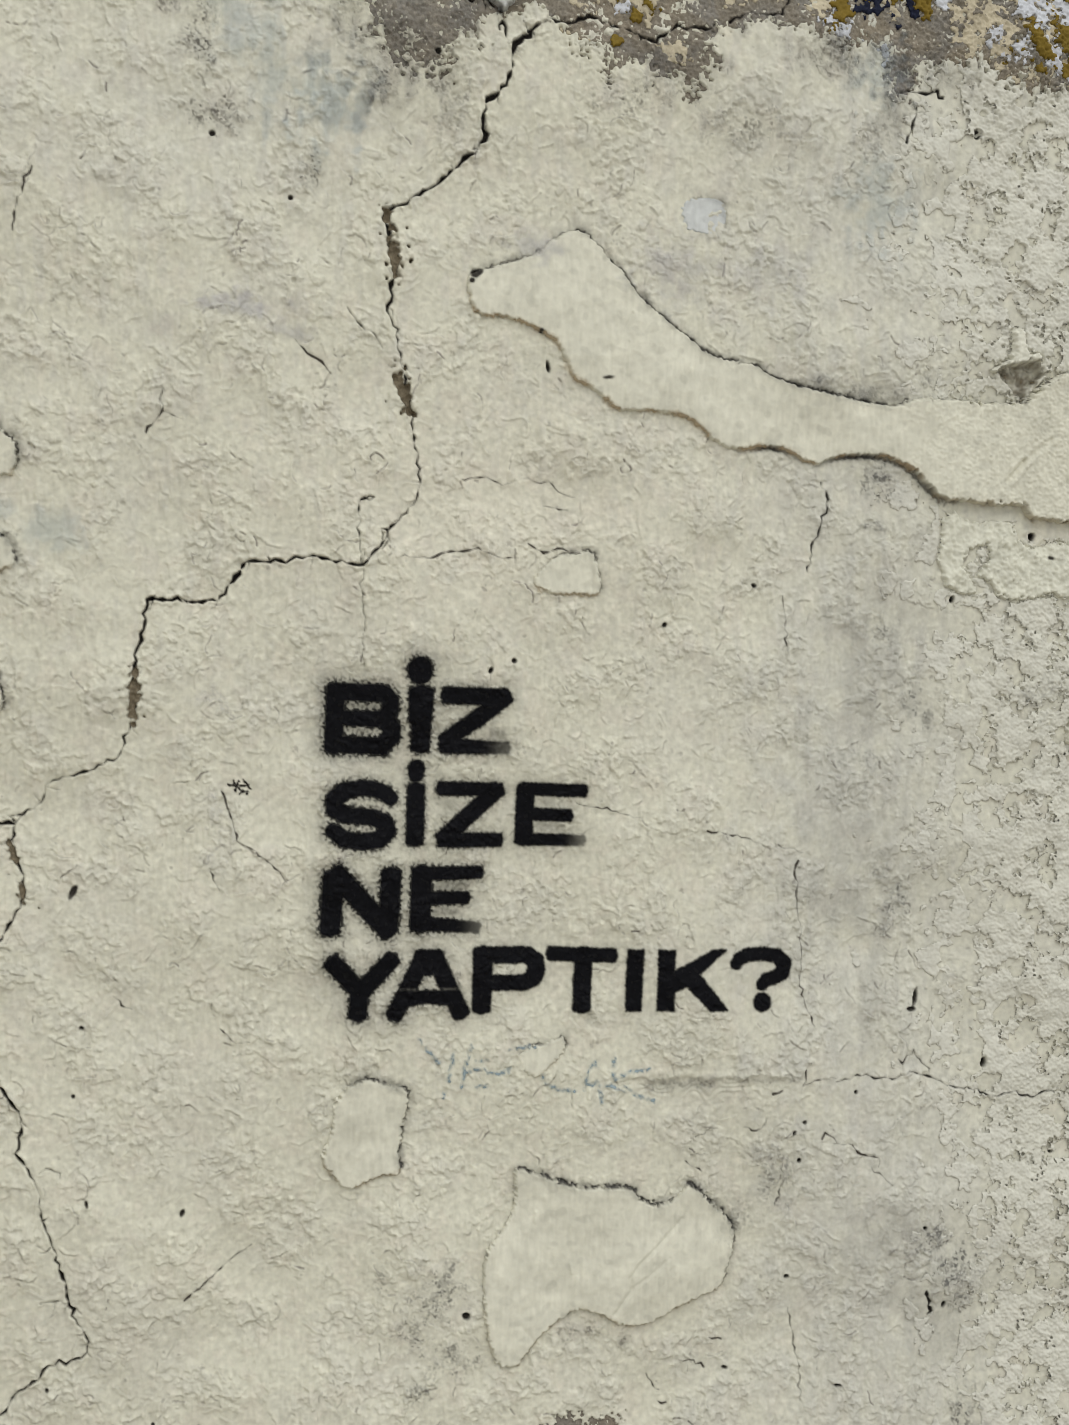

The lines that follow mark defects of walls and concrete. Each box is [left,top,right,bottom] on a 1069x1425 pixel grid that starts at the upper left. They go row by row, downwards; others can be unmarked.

crack [12,169,31,228]
flaking render [358,0,1069,404]
crack [73,0,790,776]
spalling [674,413,709,436]
spalling [741,445,814,463]
crack [0,809,28,941]
crack [221,791,278,871]
peeling [871,455,1069,1425]
crack [855,1050,1046,1097]
crack [0,1087,32,1178]
crack [0,1214,89,1415]
flaking render [539,1409,626,1425]